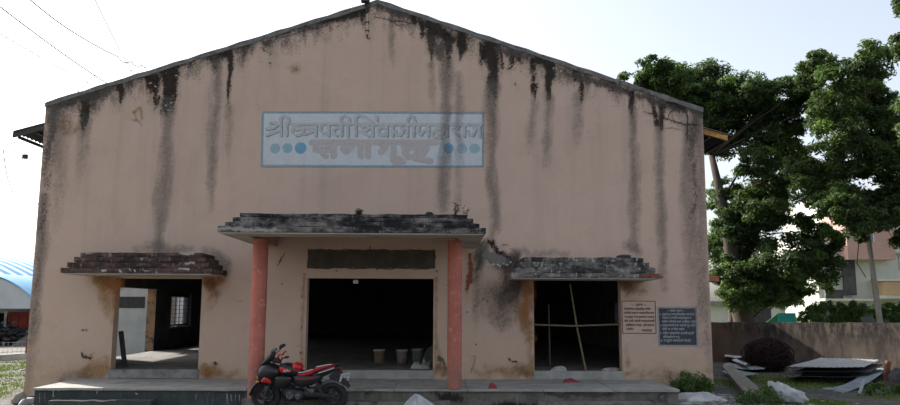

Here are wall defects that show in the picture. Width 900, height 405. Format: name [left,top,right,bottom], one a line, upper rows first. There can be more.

leakage [40,65,180,238]
leakage [207,46,248,108]
leakage [260,4,703,213]
leakage [498,254,521,309]